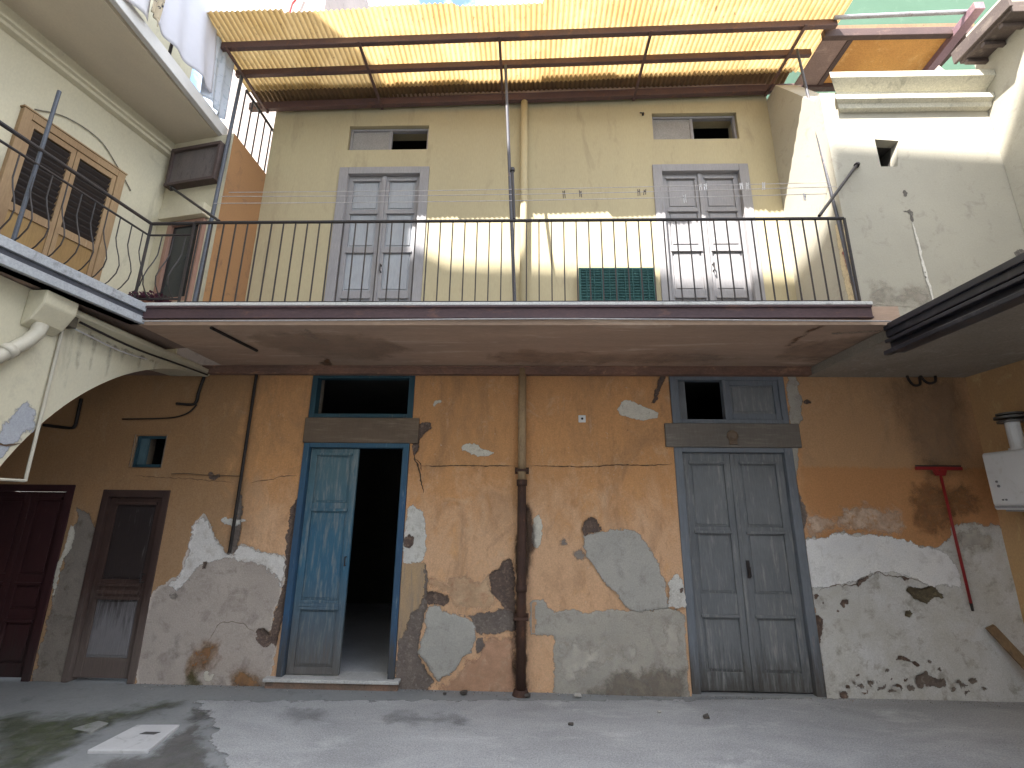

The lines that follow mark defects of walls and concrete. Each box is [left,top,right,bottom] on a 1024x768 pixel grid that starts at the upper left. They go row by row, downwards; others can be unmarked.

peeling [617,376,666,421]
peeling [0,402,36,458]
peeling [462,443,494,457]
crack [534,461,669,469]
spalling [403,534,414,548]
peeling [532,515,543,548]
peeling [32,507,95,682]
peeling [136,494,297,686]
peeling [799,495,1024,702]
peeling [395,559,516,695]
rust [186,642,217,673]